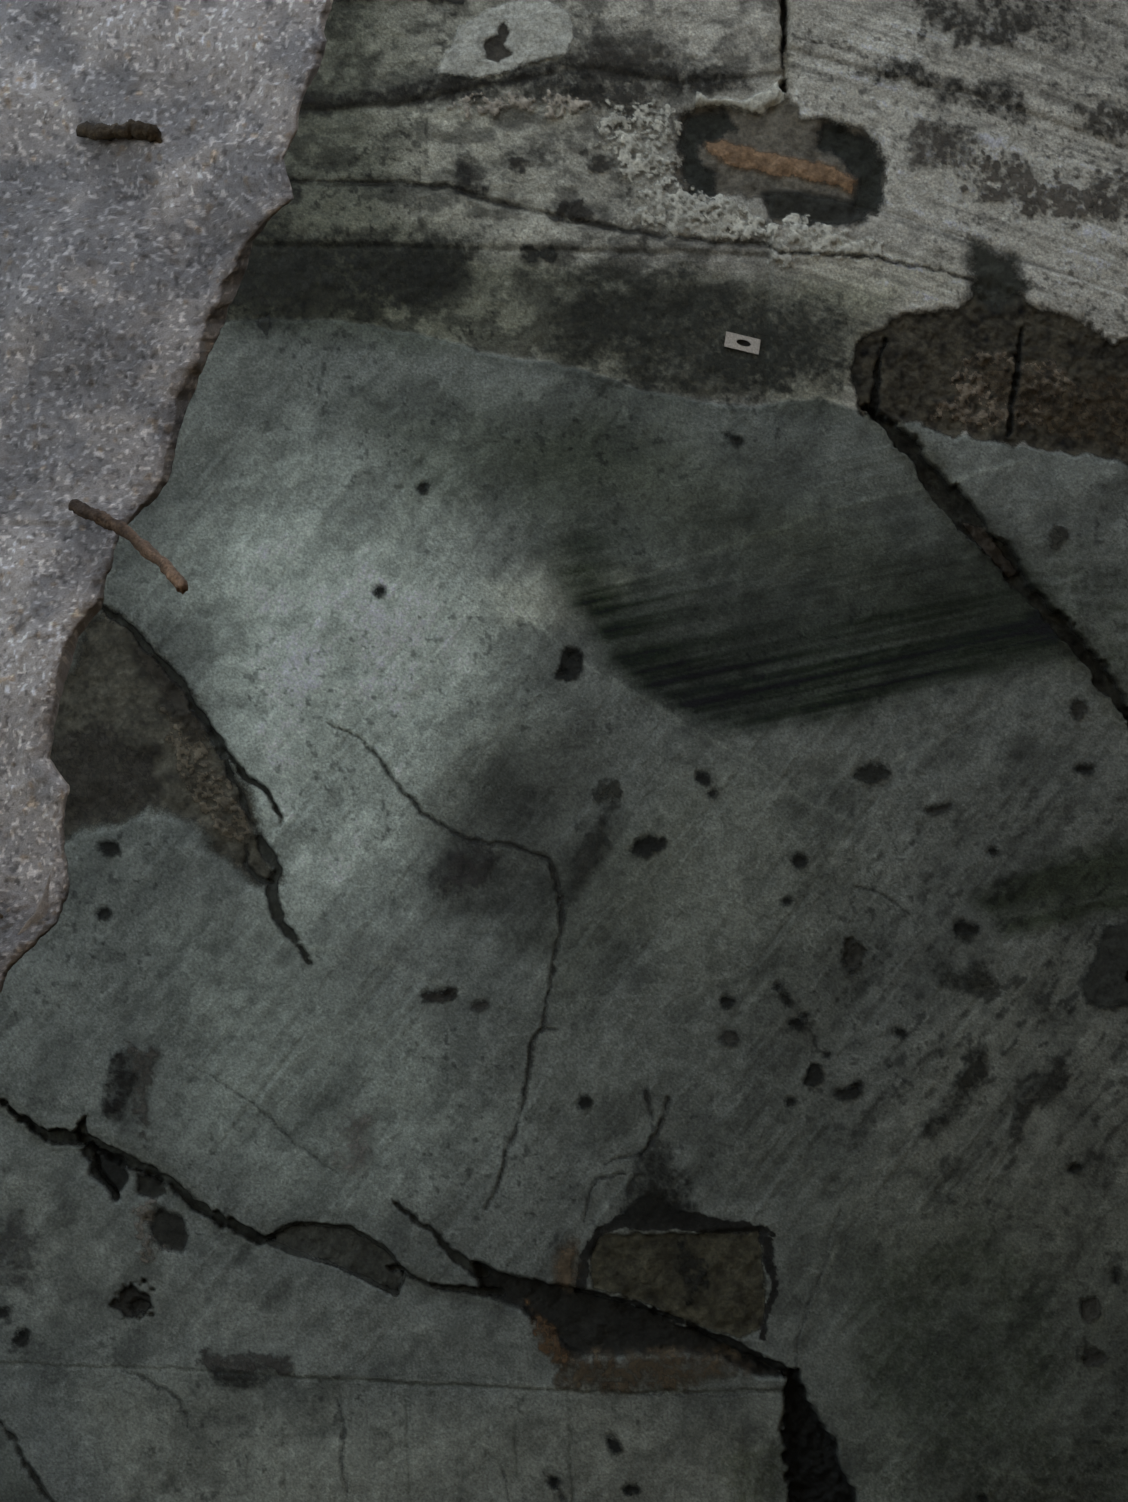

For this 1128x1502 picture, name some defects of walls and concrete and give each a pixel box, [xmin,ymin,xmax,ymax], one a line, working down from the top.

spalling [437,0,888,267]
crack [779,0,841,93]
mould [856,57,1128,230]
mould [917,0,1075,50]
spalling [850,239,1128,465]
crack [861,329,1128,721]
spalling [50,608,284,886]
spalling [96,907,111,920]
crack [0,1100,276,1245]
crack [388,1202,506,1300]
spalling [473,1196,791,1377]
crack [748,1282,856,1502]